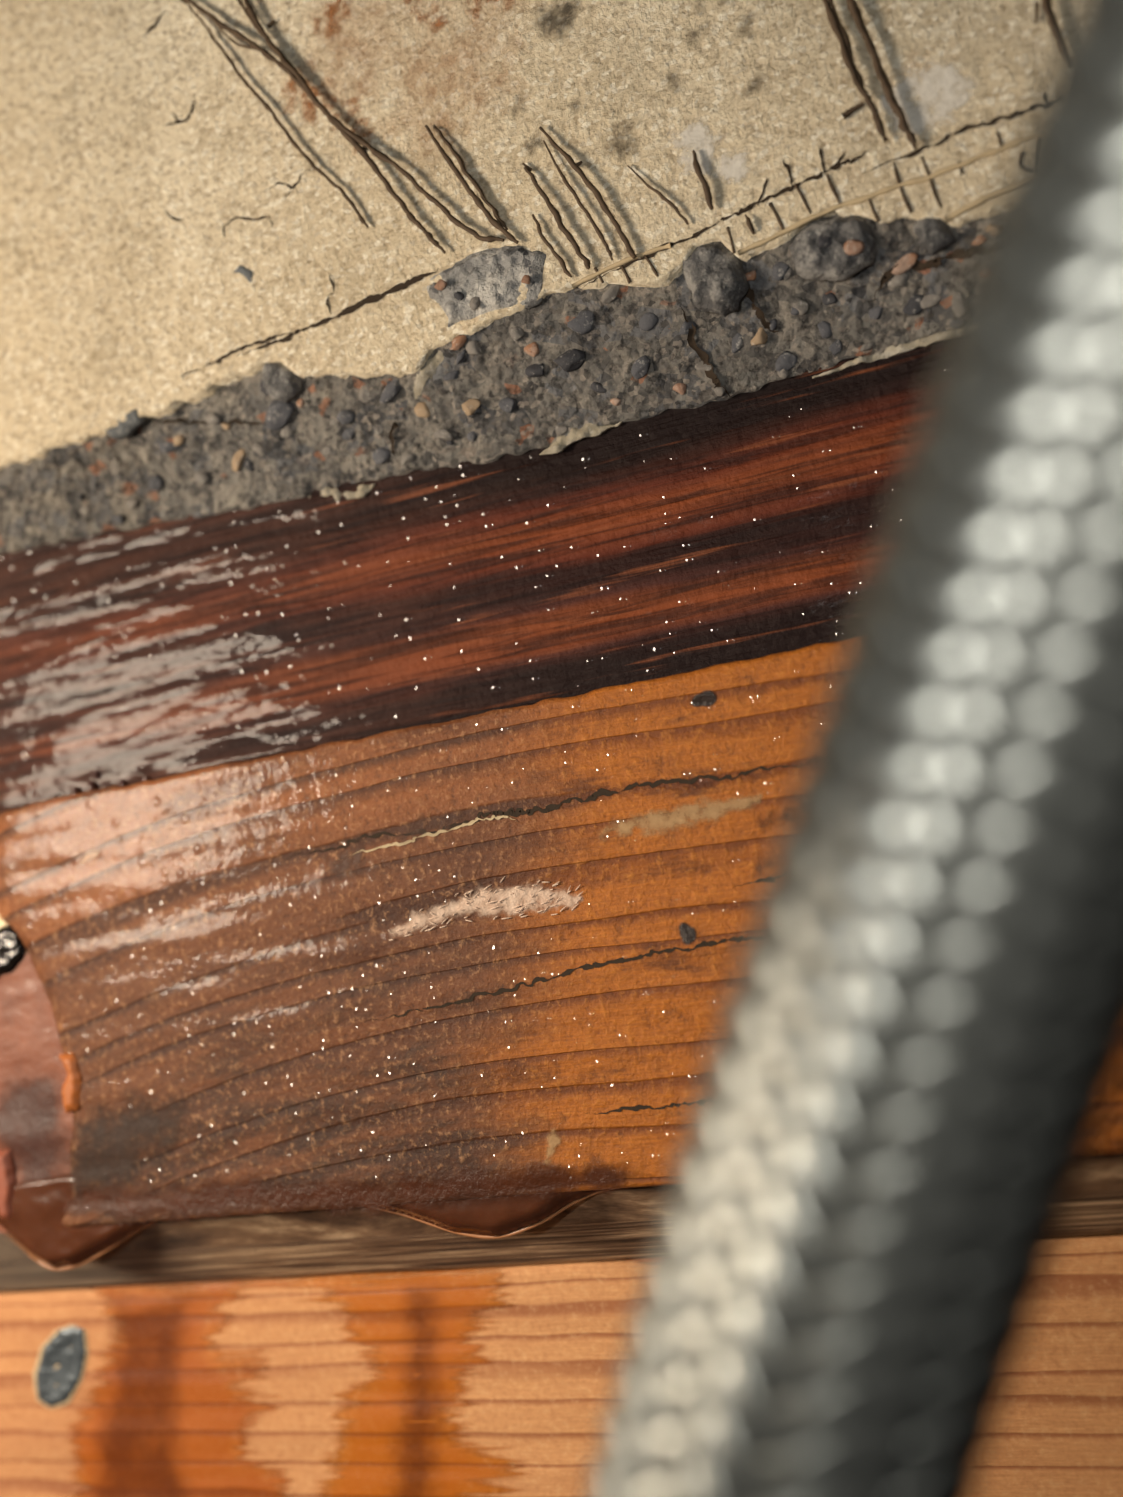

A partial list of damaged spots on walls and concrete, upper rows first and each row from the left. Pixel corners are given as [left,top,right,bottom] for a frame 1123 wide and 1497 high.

crack [140,12,164,37]
rust [327,0,348,35]
damp [541,3,575,35]
crack [165,94,195,126]
peeling [881,64,972,134]
peeling [673,123,748,182]
crack [223,169,313,235]
crack [577,92,1045,292]
spalling [0,214,993,554]
damp [691,691,716,706]
damp [70,1267,522,1497]